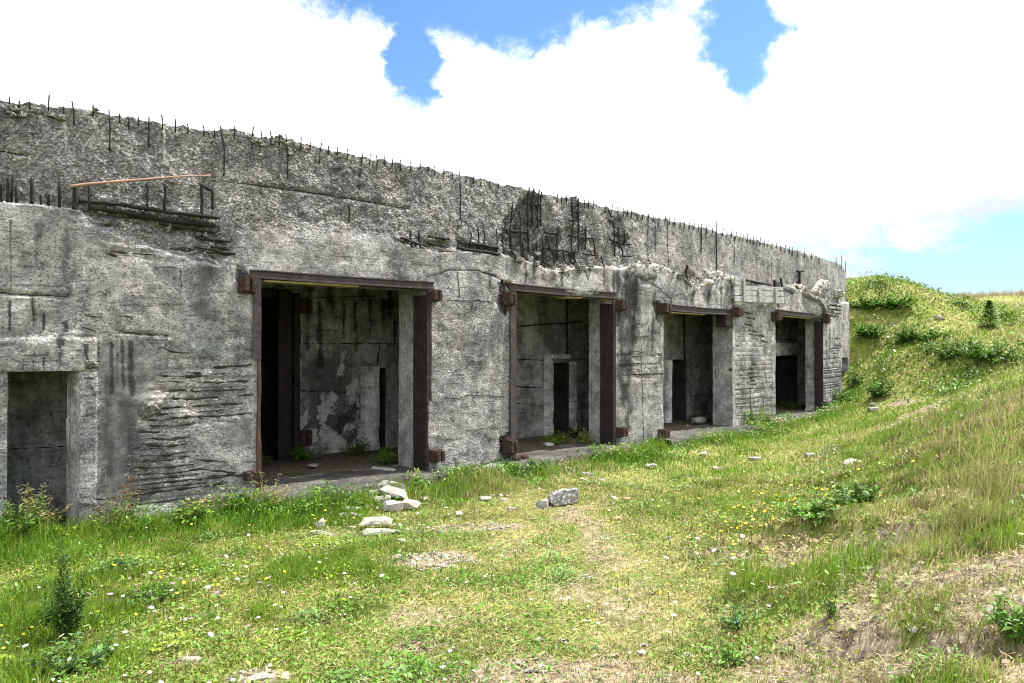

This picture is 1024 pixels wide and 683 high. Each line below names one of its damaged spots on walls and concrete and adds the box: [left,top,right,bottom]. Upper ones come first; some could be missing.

spalling [393,187,845,317]
leakage [85,339,136,489]
peeling [300,350,359,451]